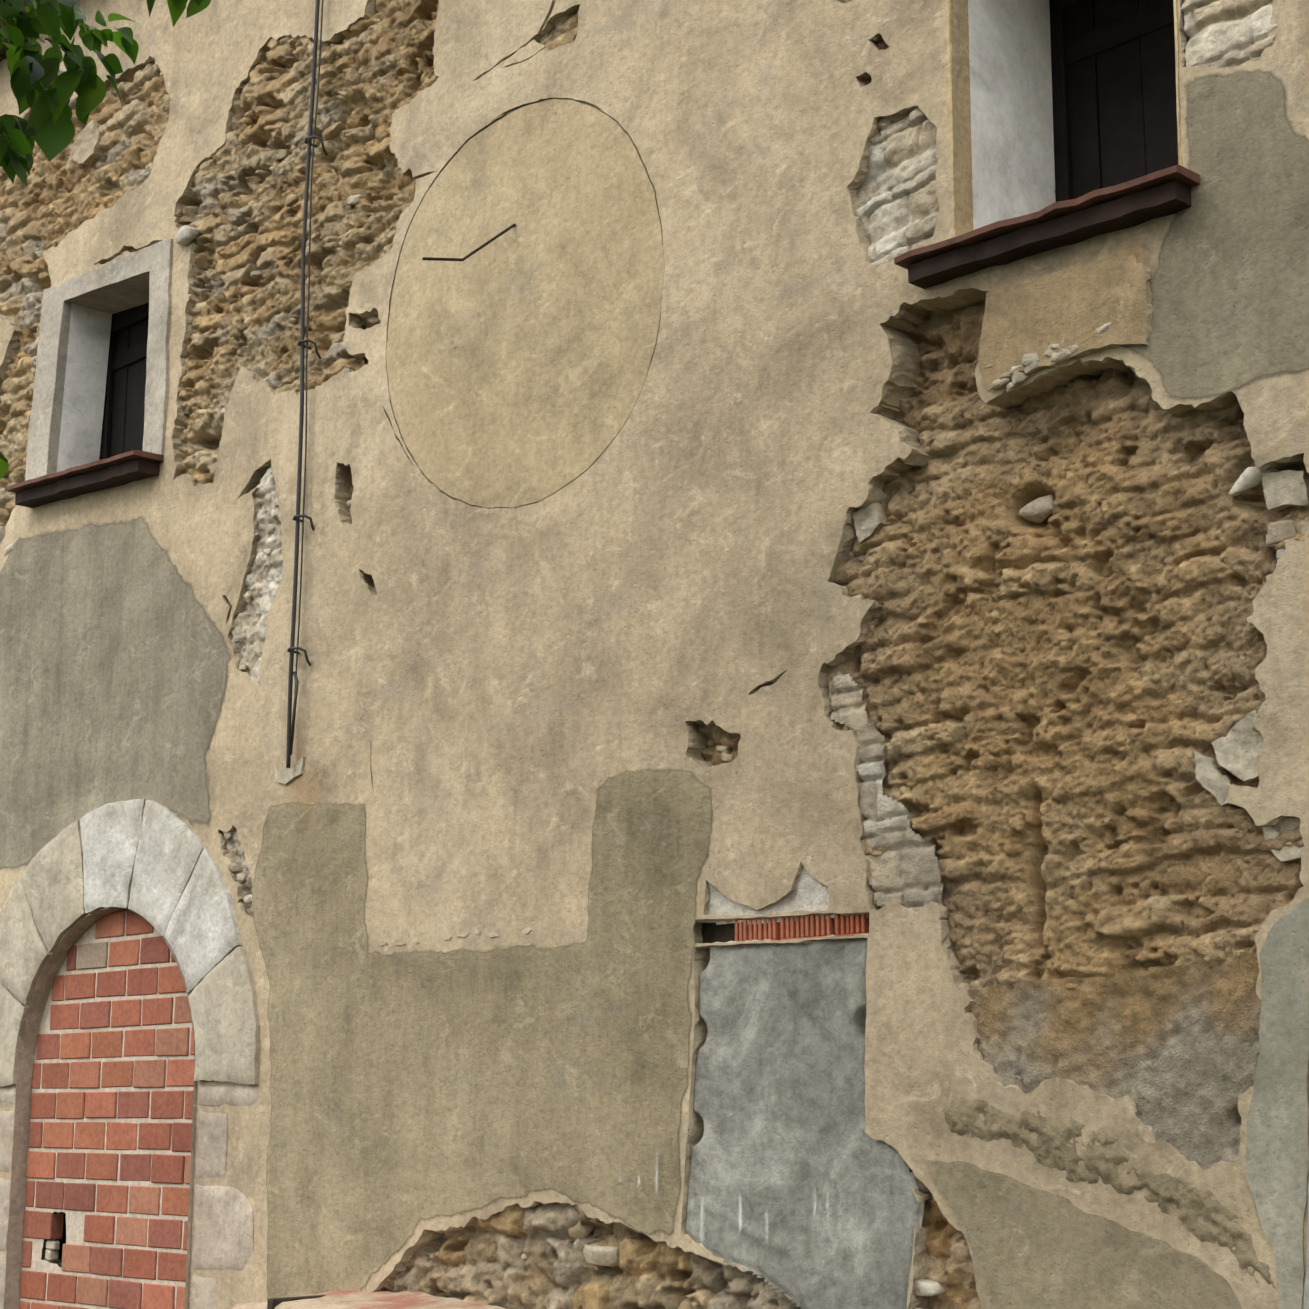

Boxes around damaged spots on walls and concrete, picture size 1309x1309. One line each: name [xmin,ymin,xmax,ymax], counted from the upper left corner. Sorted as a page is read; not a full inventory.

flaking render [1181,0,1277,68]
flaking render [0,62,171,556]
flaking render [174,0,439,486]
flaking render [856,108,940,266]
flaking render [231,466,284,682]
flaking render [699,724,741,766]
flaking render [826,301,1309,1170]
flaking render [382,1202,801,1309]
flaking render [884,1142,982,1309]
flaking render [942,1096,1277,1290]